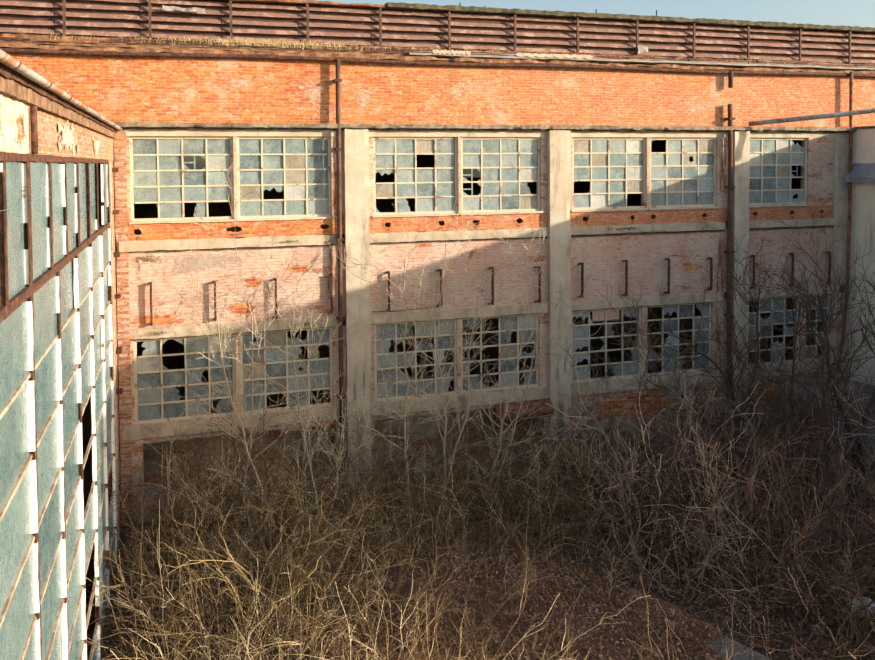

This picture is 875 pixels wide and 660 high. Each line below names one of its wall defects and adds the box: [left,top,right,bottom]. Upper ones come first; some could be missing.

peeling [58,120,79,153]
flaking render [225,275,264,316]